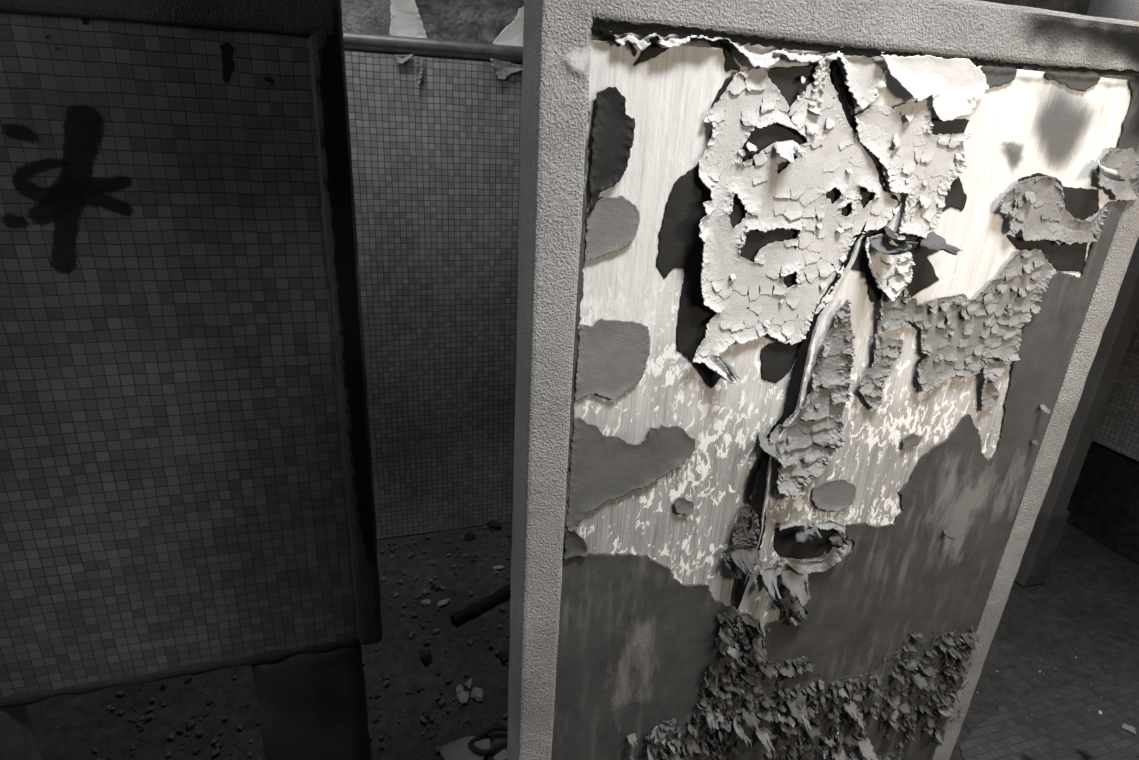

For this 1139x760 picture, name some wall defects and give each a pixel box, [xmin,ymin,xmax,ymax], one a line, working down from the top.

spalling [390,0,524,46]
peeling [565,31,1139,760]